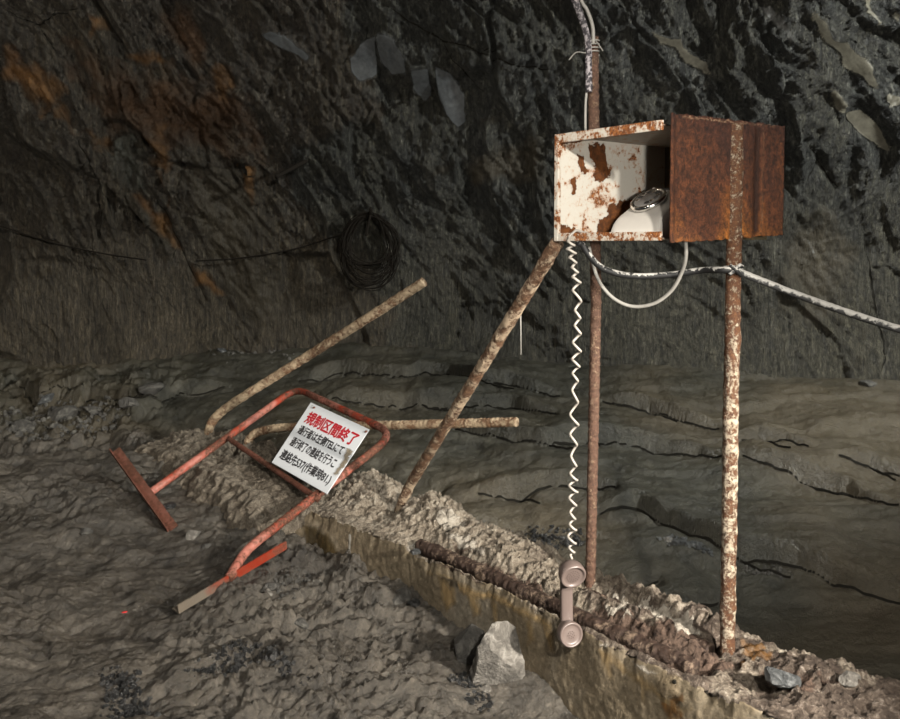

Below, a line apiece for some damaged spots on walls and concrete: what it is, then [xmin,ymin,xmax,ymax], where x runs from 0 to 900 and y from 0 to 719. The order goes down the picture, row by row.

spalling [434,509,485,555]